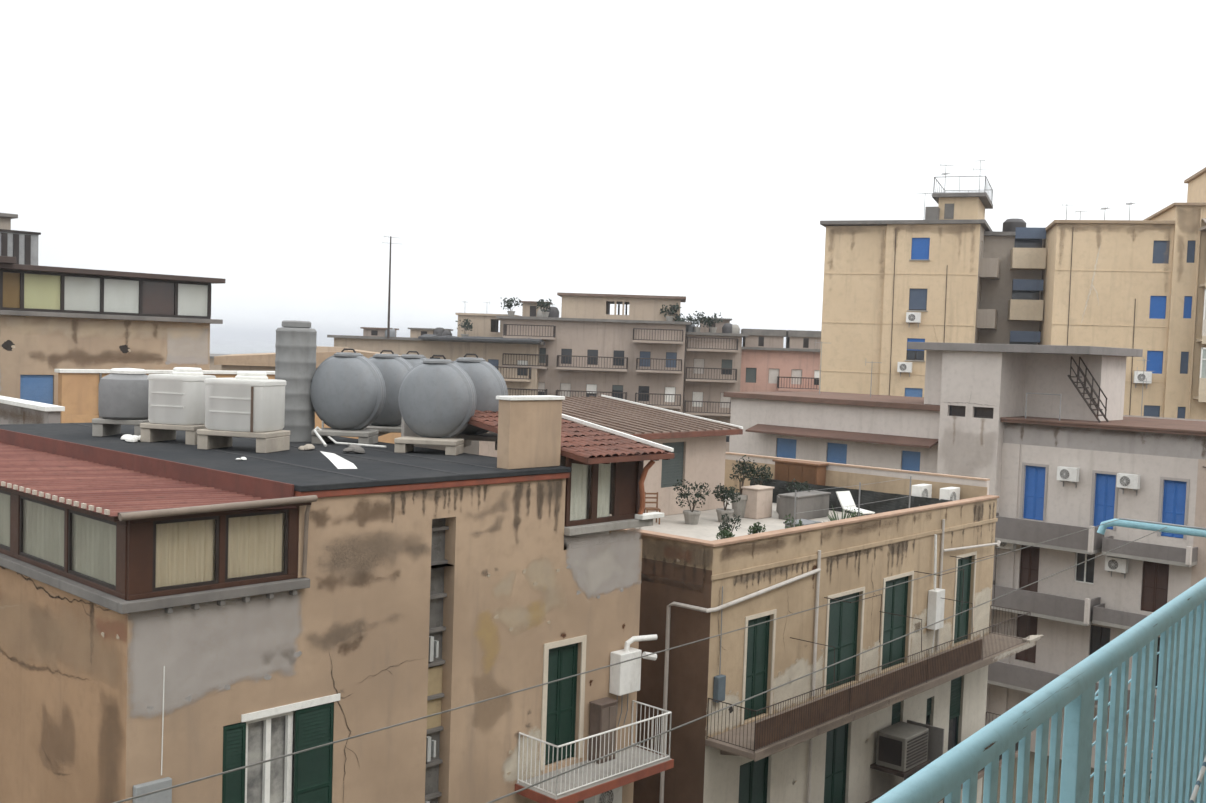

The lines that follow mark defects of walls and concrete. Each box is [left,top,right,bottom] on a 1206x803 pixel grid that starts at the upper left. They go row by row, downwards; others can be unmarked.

damp [309,479,564,593]
damp [615,501,995,591]
crack [329,654,424,801]